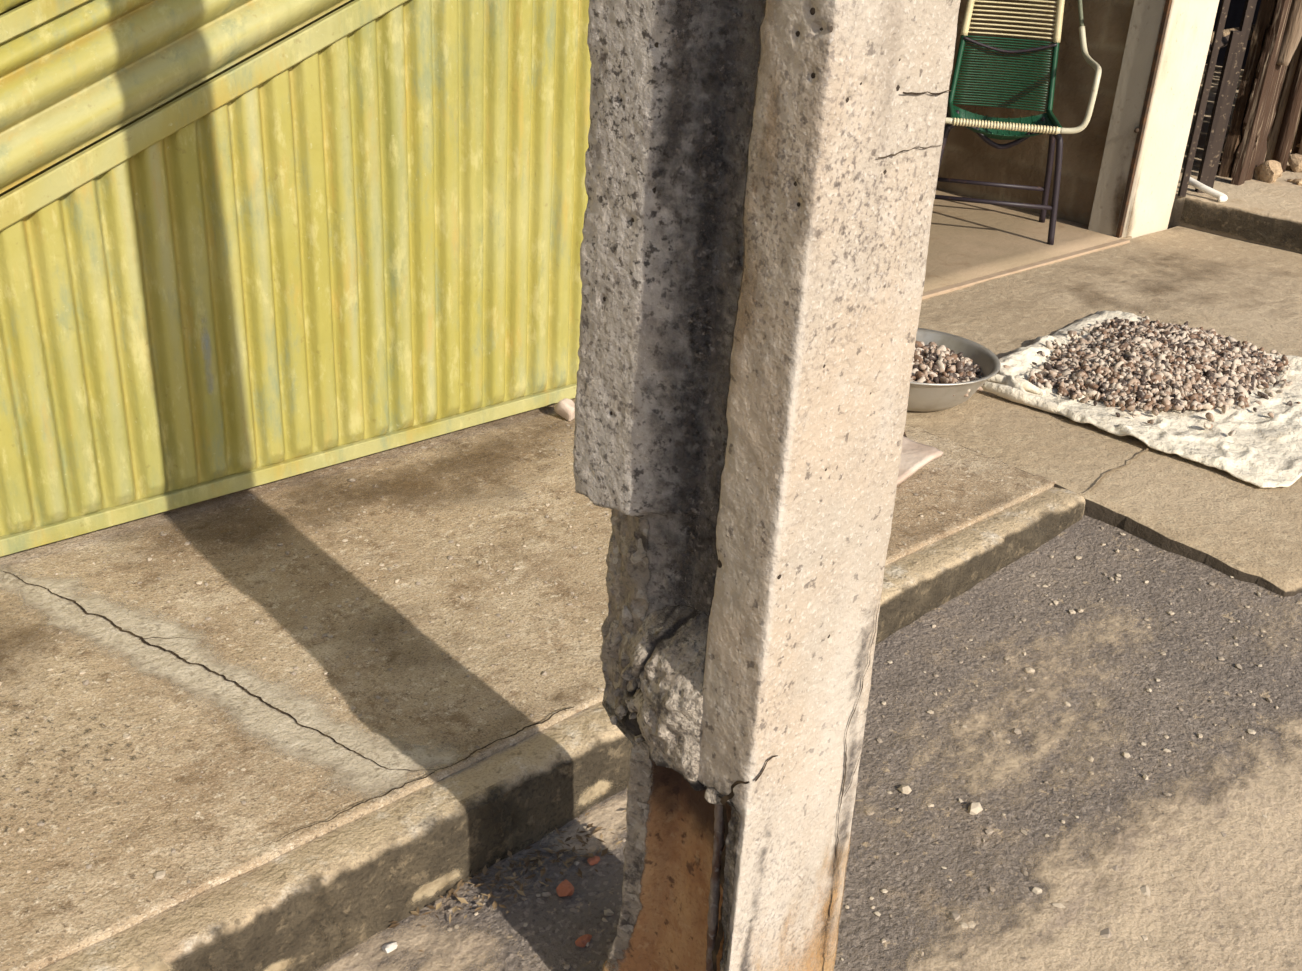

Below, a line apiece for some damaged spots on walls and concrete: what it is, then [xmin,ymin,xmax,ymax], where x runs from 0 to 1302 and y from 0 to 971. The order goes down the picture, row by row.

leakage [648,0,766,617]
crack [3,571,573,848]
spalling [576,492,653,971]
corrosion [602,760,731,971]
spalling [705,787,741,971]